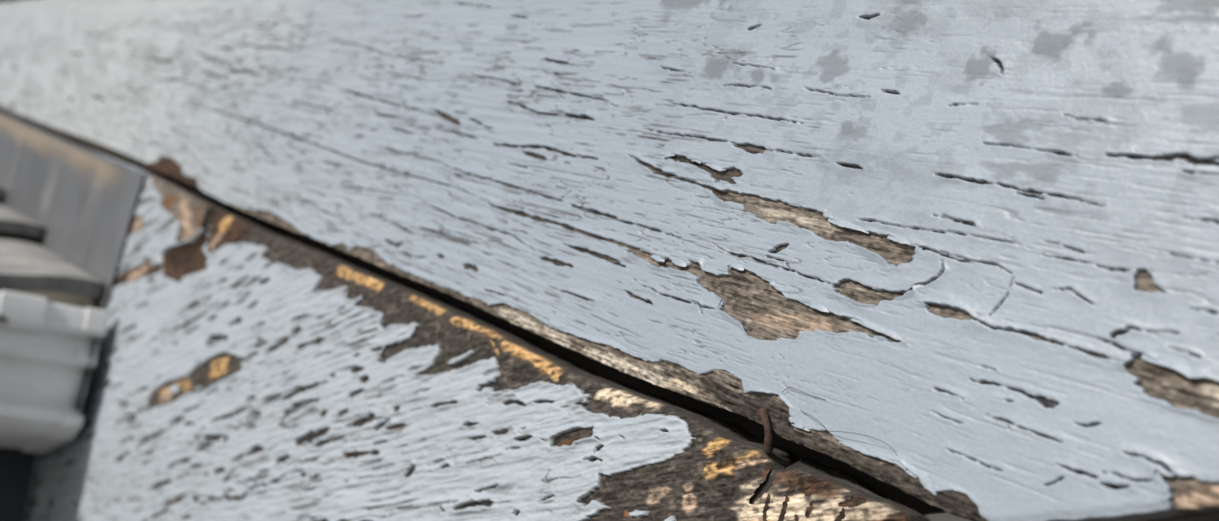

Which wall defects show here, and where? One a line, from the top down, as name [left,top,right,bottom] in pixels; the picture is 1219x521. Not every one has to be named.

crack [668,65,796,144]
crack [151,44,714,309]
peeling [638,153,970,267]
crack [941,175,1098,205]
crack [1108,155,1219,174]
peeling [573,229,936,343]
crack [731,253,824,282]
crack [868,218,1146,301]
peeling [929,304,1110,359]
peeling [146,353,244,412]
peeling [551,428,593,448]
peeling [1128,453,1219,515]